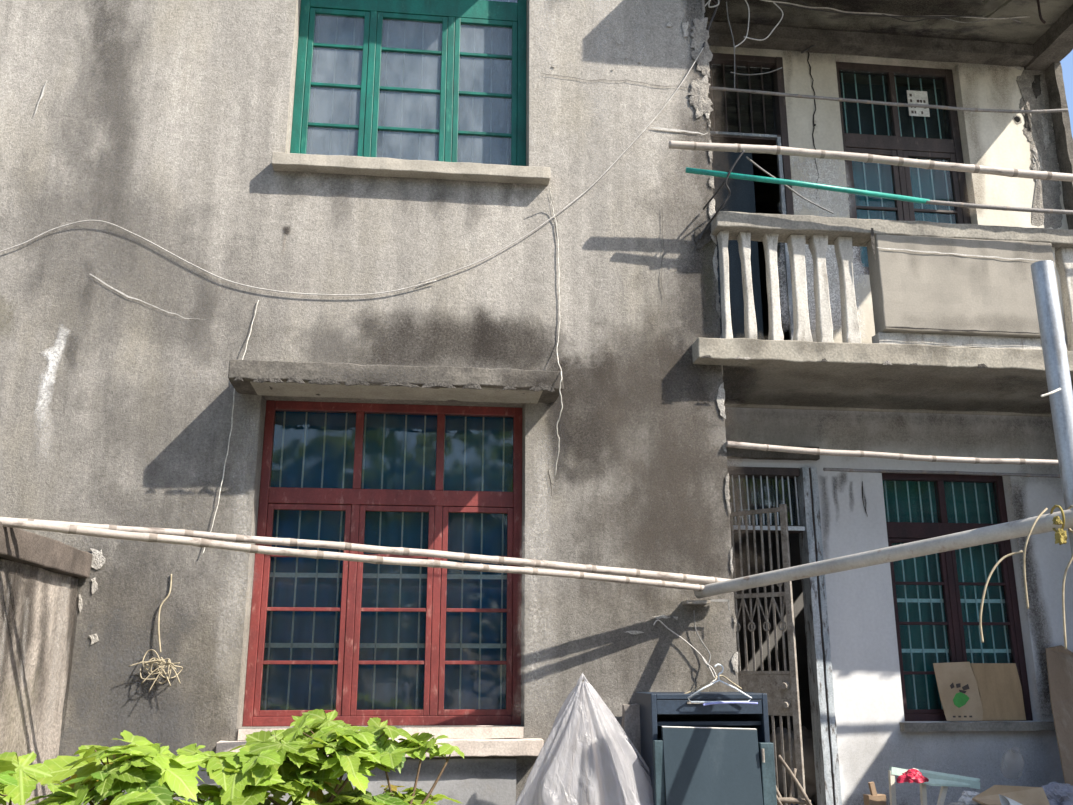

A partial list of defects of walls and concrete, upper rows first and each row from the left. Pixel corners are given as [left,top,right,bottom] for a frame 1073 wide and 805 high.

spalling [682,0,713,162]
crack [807,52,819,194]
damp [749,0,1014,44]
flaking render [1012,66,1063,229]
spalling [694,176,721,317]
damp [313,314,731,576]
spalling [701,355,726,419]
damp [0,558,48,693]
damp [67,580,78,693]
flaking render [78,548,106,612]